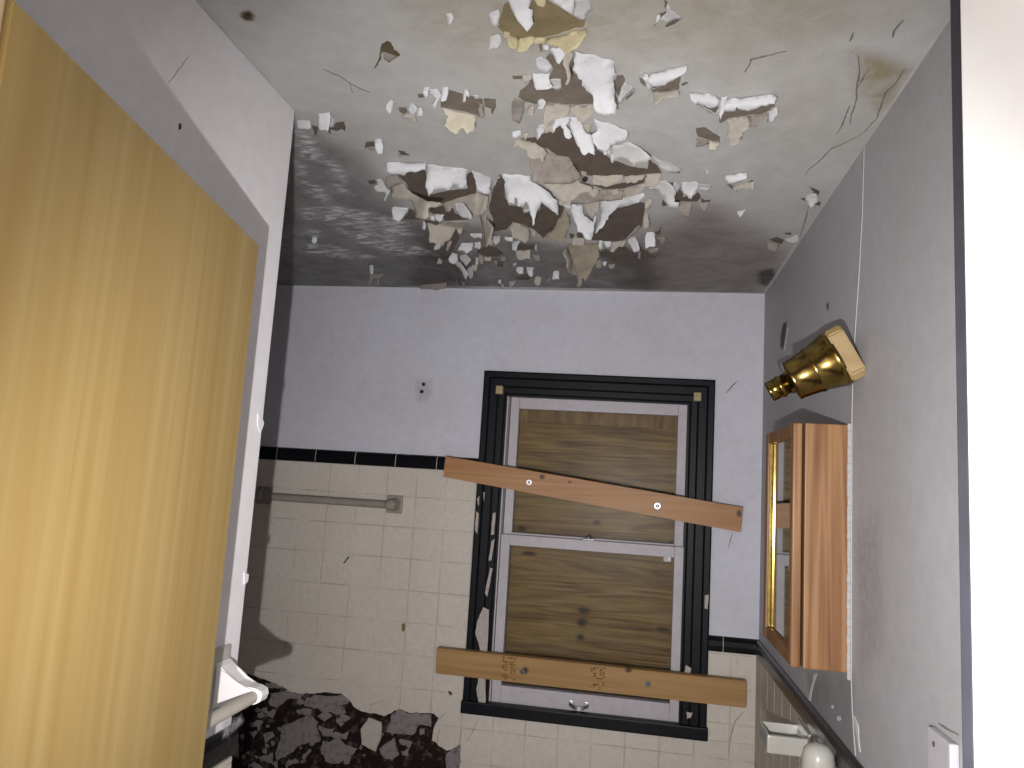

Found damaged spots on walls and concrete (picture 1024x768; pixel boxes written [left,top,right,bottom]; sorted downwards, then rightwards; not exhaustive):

crack [324,69,371,93]
leakage [278,129,458,287]
peeling [365,0,778,290]
crack [805,32,905,175]
peeling [475,512,496,651]
peeling [476,678,486,703]